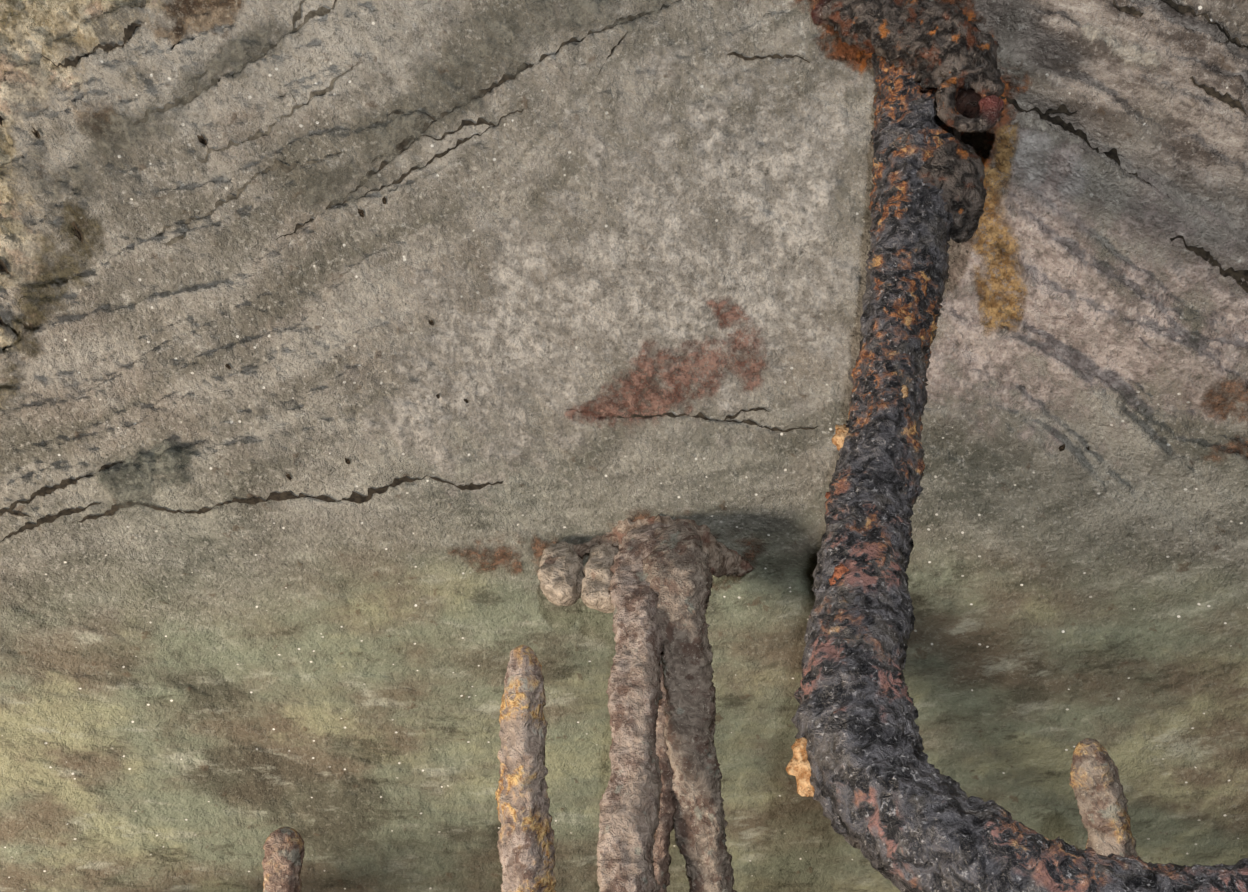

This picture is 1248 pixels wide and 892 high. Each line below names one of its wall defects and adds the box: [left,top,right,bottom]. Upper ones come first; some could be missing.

crack [133,0,680,246]
crack [727,52,810,63]
corrosion [819,23,873,71]
crack [1000,96,1169,197]
crack [1113,0,1248,48]
crack [1189,76,1247,115]
corrosion [970,75,1027,332]
crack [1170,235,1248,293]
corrosion [565,300,766,427]
crack [0,461,503,542]